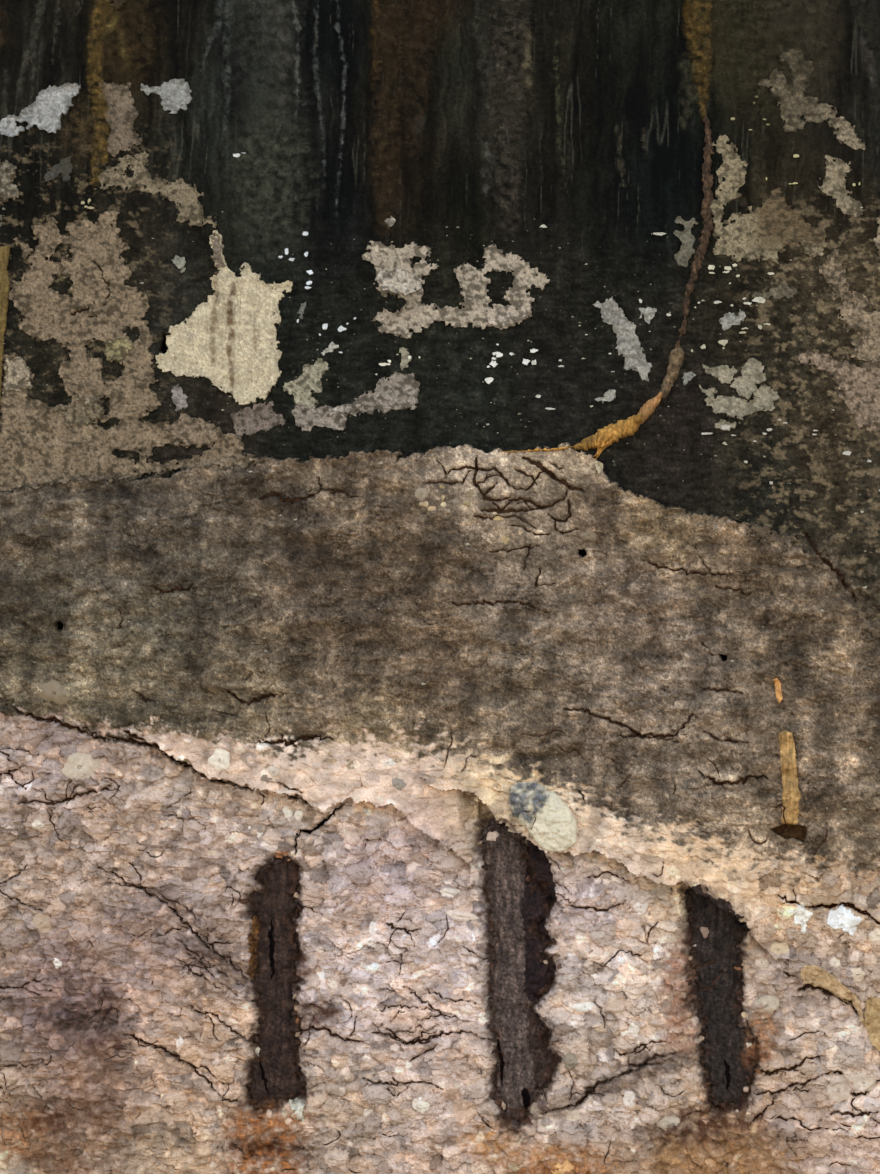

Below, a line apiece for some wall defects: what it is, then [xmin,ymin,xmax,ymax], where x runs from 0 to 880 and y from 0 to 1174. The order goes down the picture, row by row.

flaking render [757,49,880,273]
flaking render [0,79,550,492]
peeling [673,216,698,267]
flaking render [709,134,880,433]
peeling [682,358,787,442]
crack [0,747,119,811]
crack [14,707,254,791]
crack [259,735,333,747]
crack [281,783,343,854]
spalling [0,679,880,1174]
crack [778,895,880,924]
corrosion [228,856,338,1174]